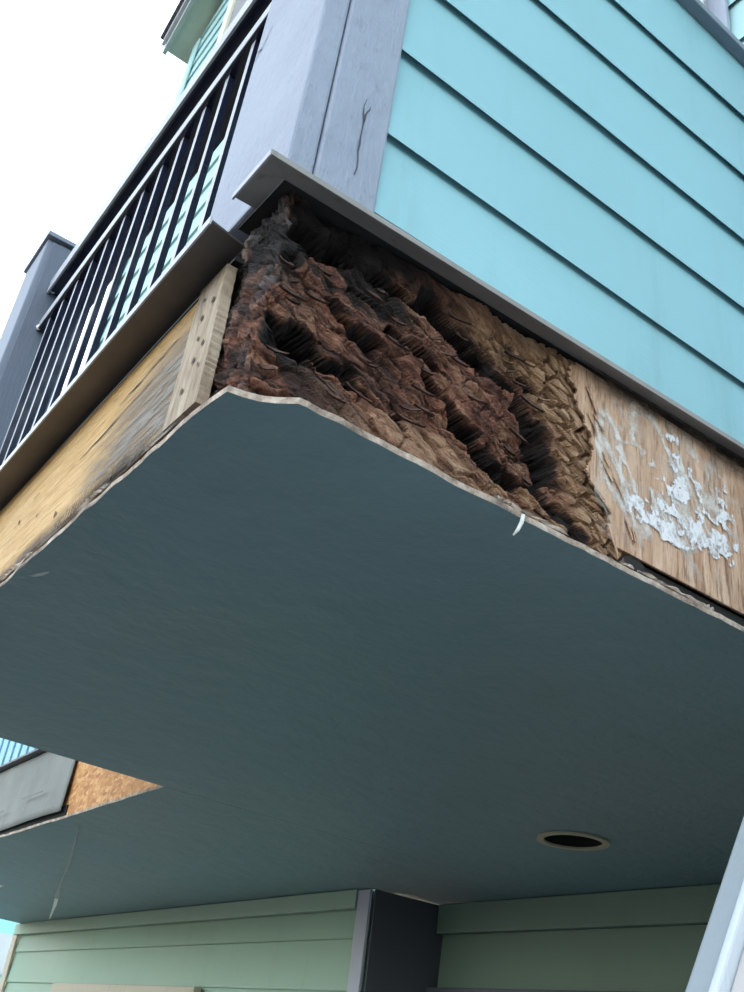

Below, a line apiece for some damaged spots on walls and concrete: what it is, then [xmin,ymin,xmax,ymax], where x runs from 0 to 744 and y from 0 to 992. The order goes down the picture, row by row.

crack [354,100,371,175]
damp [594,370,744,553]